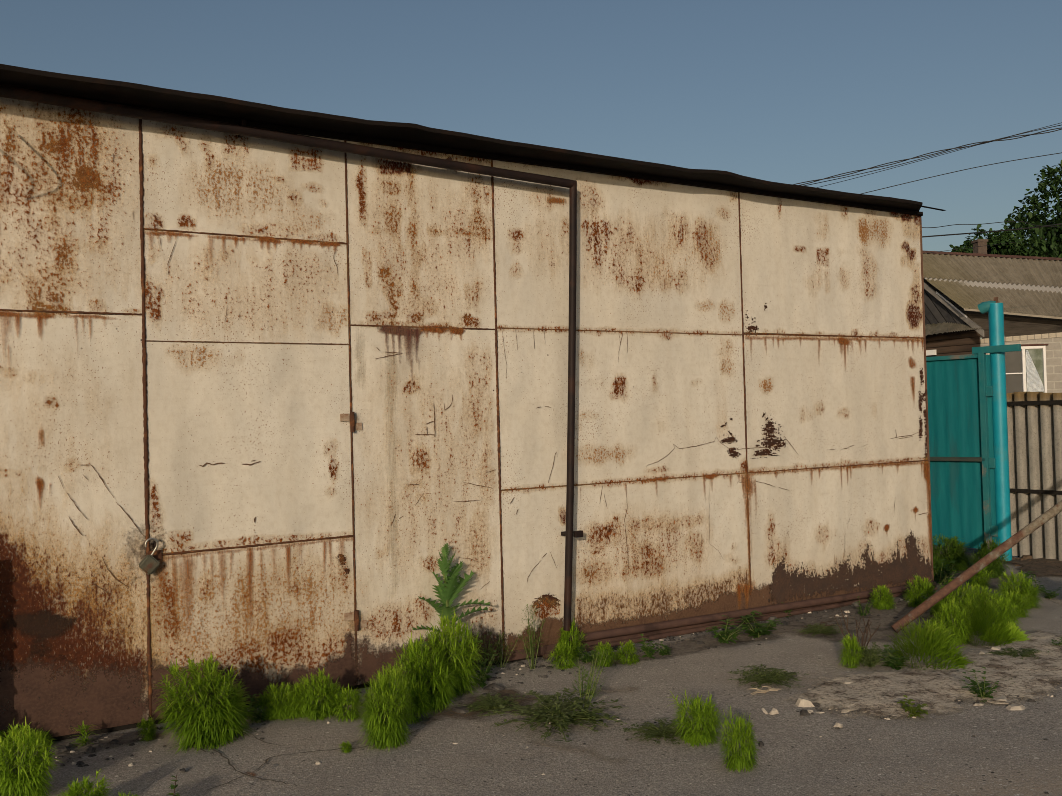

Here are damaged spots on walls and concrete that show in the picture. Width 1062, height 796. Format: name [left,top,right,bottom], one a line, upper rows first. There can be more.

rust [0,101,195,335]
rust [529,185,564,207]
rust [536,180,729,294]
rust [795,218,847,286]
rust [857,209,920,296]
rust [124,135,495,581]
rust [498,325,713,339]
rust [699,285,924,373]
rust [576,444,632,463]
peeling [720,413,786,459]
rust [0,457,933,743]
crack [192,734,382,790]